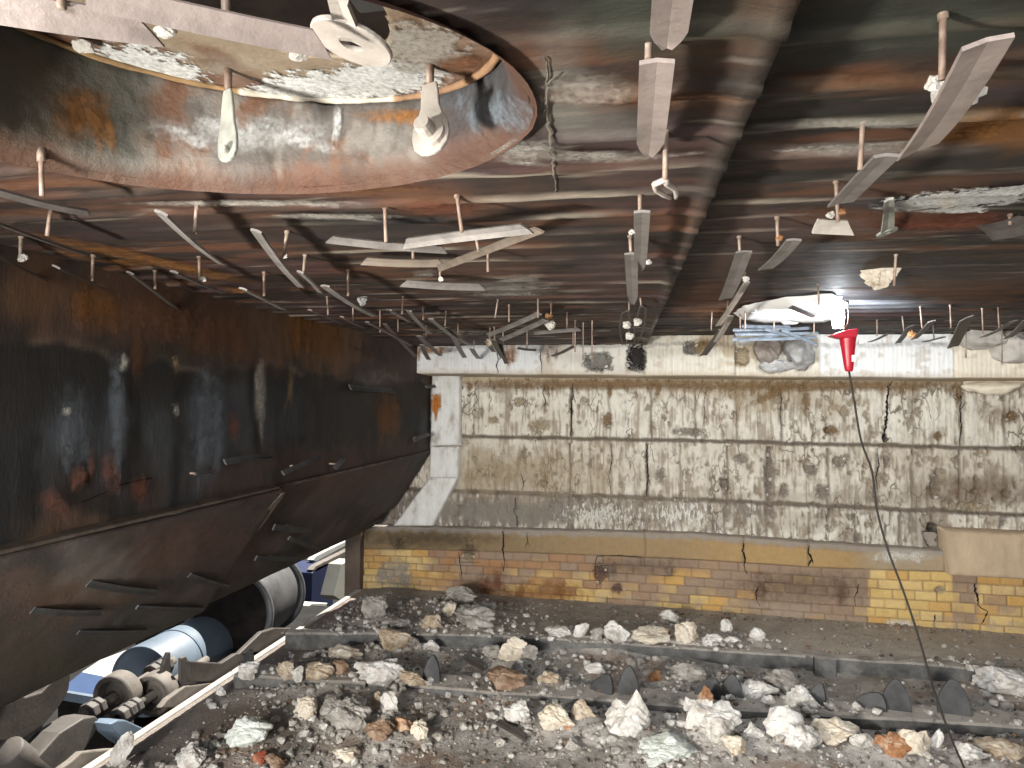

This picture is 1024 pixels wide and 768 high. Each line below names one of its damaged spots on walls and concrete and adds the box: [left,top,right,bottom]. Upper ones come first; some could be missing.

crack [539,58,557,193]
spalling [584,344,647,372]
corrosion [431,394,441,420]
crack [540,351,576,434]
crack [606,428,651,496]
crack [872,381,893,490]
crack [502,475,530,571]
crack [741,543,760,605]
crack [974,584,988,624]